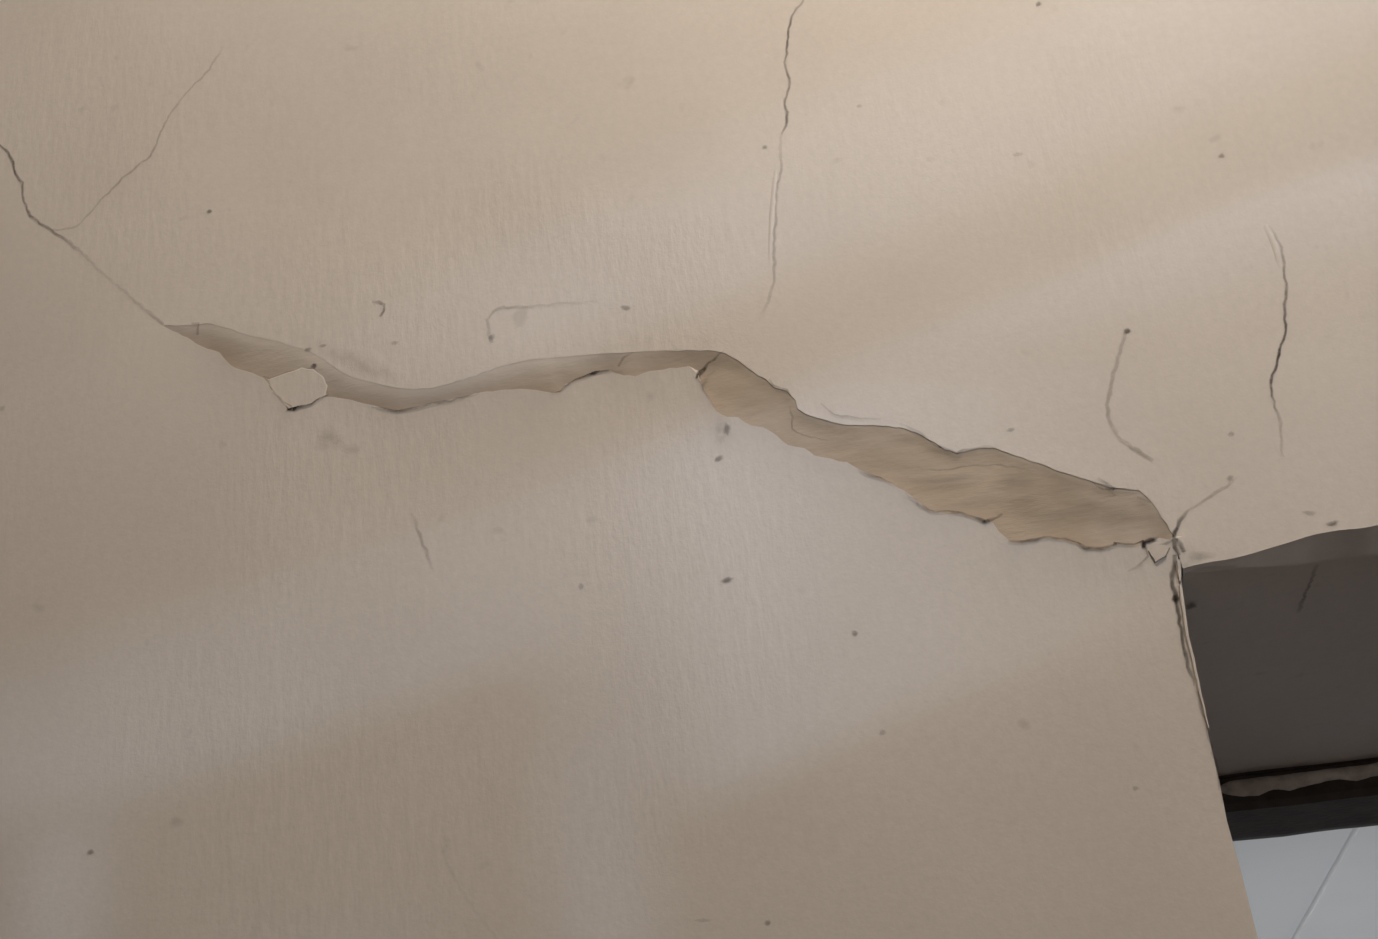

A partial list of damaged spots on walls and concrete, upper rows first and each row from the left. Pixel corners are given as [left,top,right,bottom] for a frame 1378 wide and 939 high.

spalling [164,323,1209,732]
crack [1270,316,1287,392]